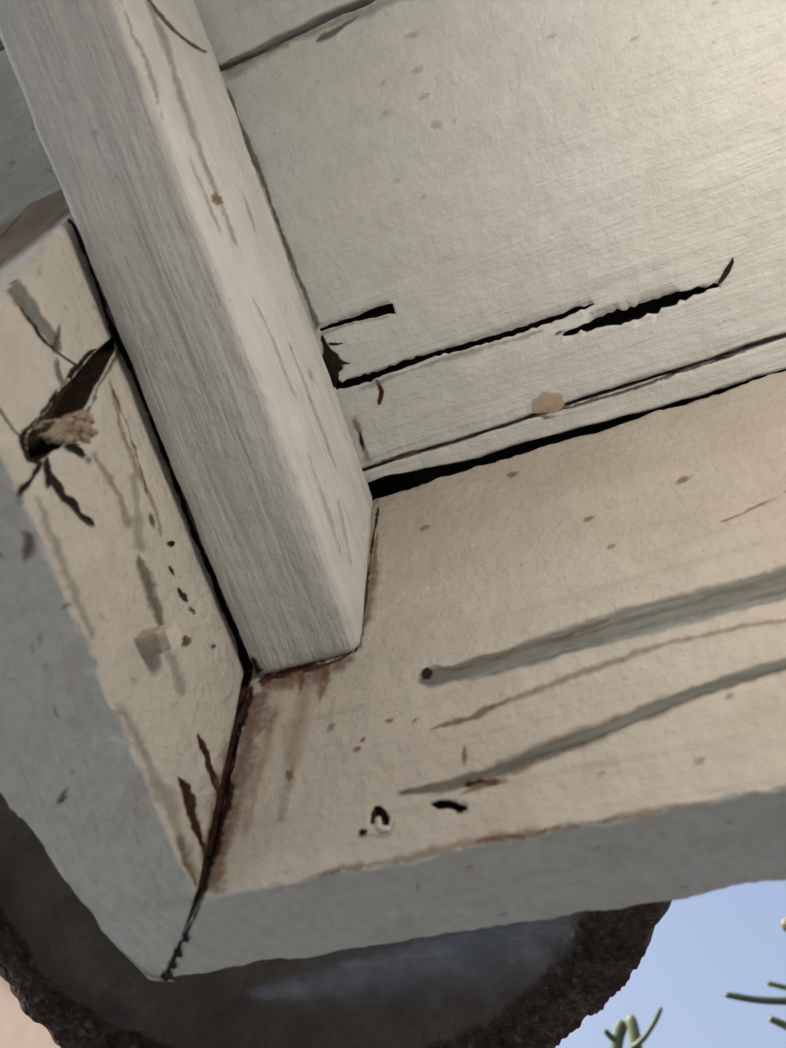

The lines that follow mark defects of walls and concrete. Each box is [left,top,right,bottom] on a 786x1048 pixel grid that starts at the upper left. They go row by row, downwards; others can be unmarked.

crack [320,258,734,390]
crack [381,418,524,462]
peeling [532,392,566,419]
crack [559,333,786,411]
leakage [420,567,786,686]
leakage [400,658,786,794]
peeling [359,806,390,836]